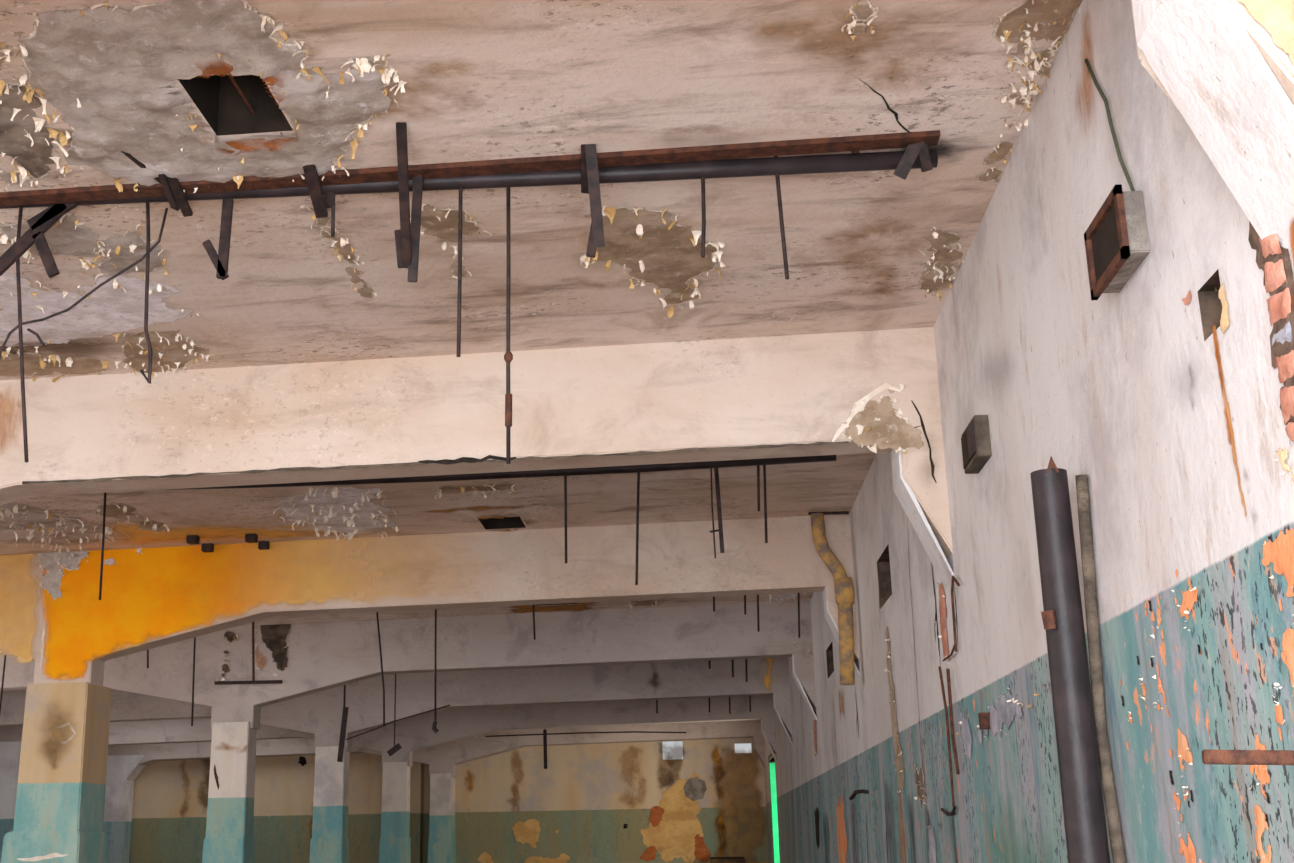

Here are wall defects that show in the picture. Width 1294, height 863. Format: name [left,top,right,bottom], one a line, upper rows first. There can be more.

peeling [0,0,407,193]
peeling [976,0,1083,184]
peeling [0,213,211,382]
peeling [579,203,727,318]
rust [1213,326,1247,516]
peeling [273,486,398,542]
water stain [0,526,347,679]
water stain [46,716,67,767]
flaking render [640,772,711,863]
water stain [712,747,765,863]
peeling [1120,656,1204,863]
peeling [1249,528,1294,863]